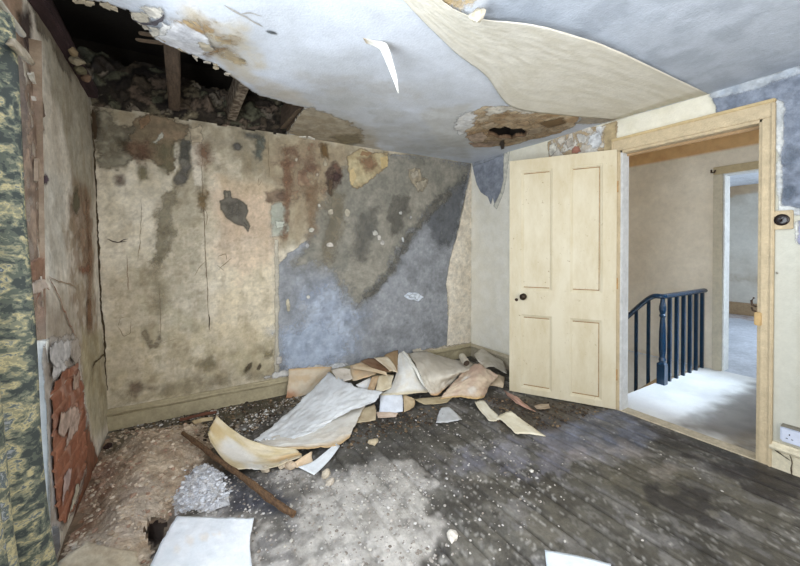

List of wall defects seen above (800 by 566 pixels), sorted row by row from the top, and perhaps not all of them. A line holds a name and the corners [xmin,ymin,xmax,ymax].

peeling [131,6,231,76]
crack [37,109,177,390]
leakage [91,103,136,184]
flaking render [123,114,203,175]
leakage [153,140,192,266]
crack [196,159,210,330]
leakage [266,189,287,202]
leakage [289,107,365,145]
peeling [347,148,389,189]
leakage [293,154,471,303]
flaking render [454,106,618,157]
flaking render [42,333,98,530]